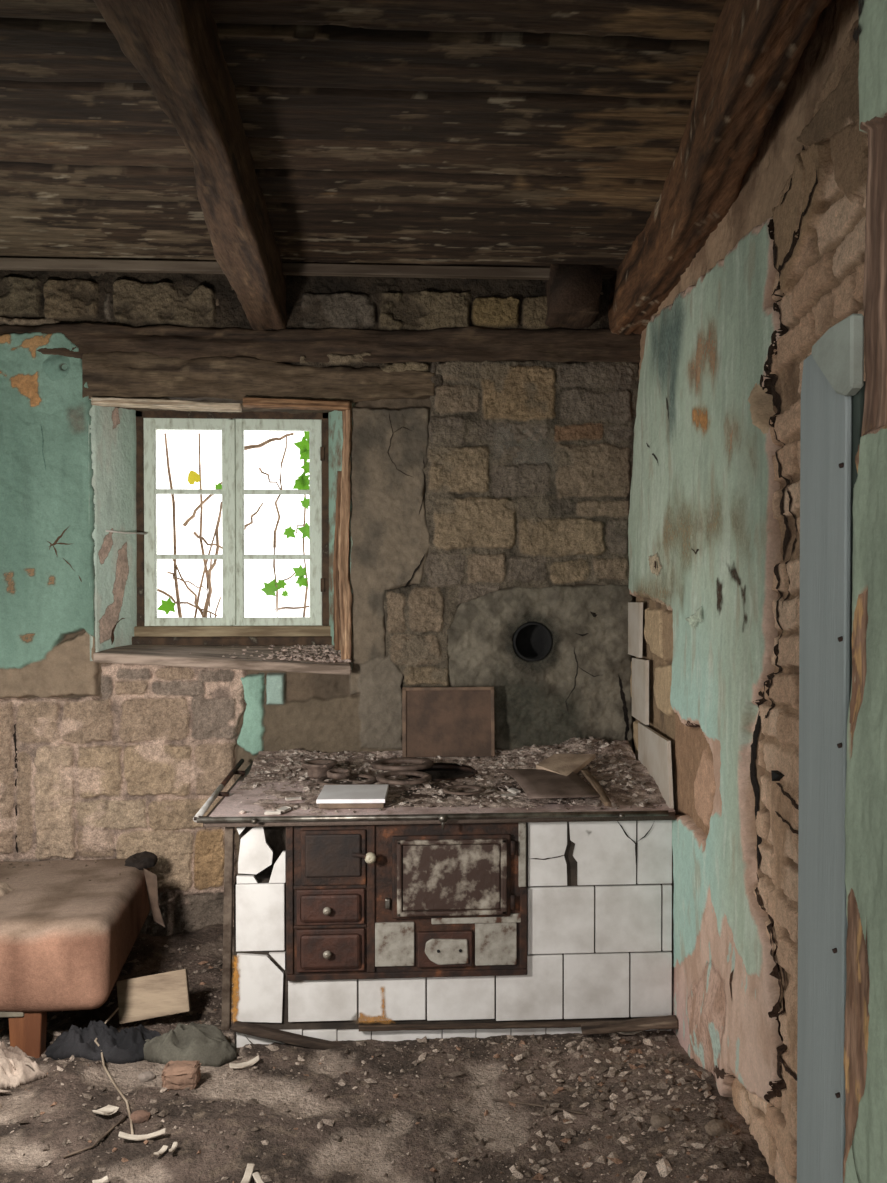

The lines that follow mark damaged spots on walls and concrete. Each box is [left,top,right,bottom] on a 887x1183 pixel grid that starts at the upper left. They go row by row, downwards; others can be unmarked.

peeling [4,569,34,594]
peeling [98,529,129,643]
crack [565,611,629,741]
crack [750,145,818,1107]
flaking render [731,0,887,1183]
flaking render [0,663,247,936]
crack [618,822,654,867]